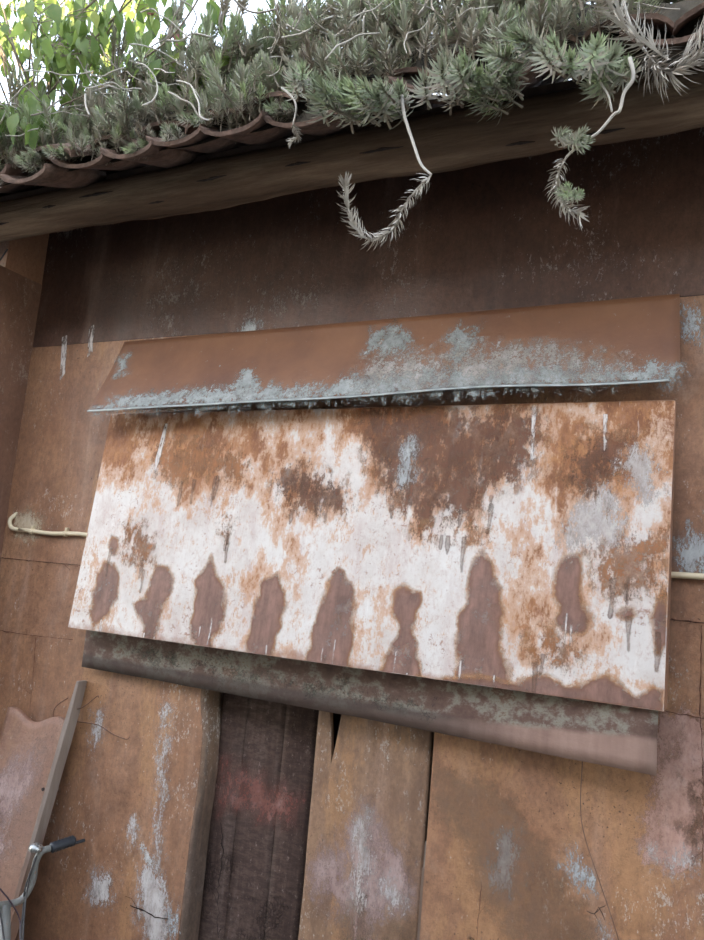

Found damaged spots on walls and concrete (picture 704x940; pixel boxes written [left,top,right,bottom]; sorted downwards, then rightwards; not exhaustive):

peeling [85,318,691,420]
corrosion [148,434,250,498]
corrosion [269,460,359,523]
corrosion [89,519,173,639]
corrosion [190,516,231,647]
corrosion [246,573,286,656]
corrosion [305,567,355,666]
corrosion [355,405,670,711]
peeling [672,519,704,573]
peeling [86,701,107,756]
peeling [124,697,181,940]
peeling [77,861,122,917]